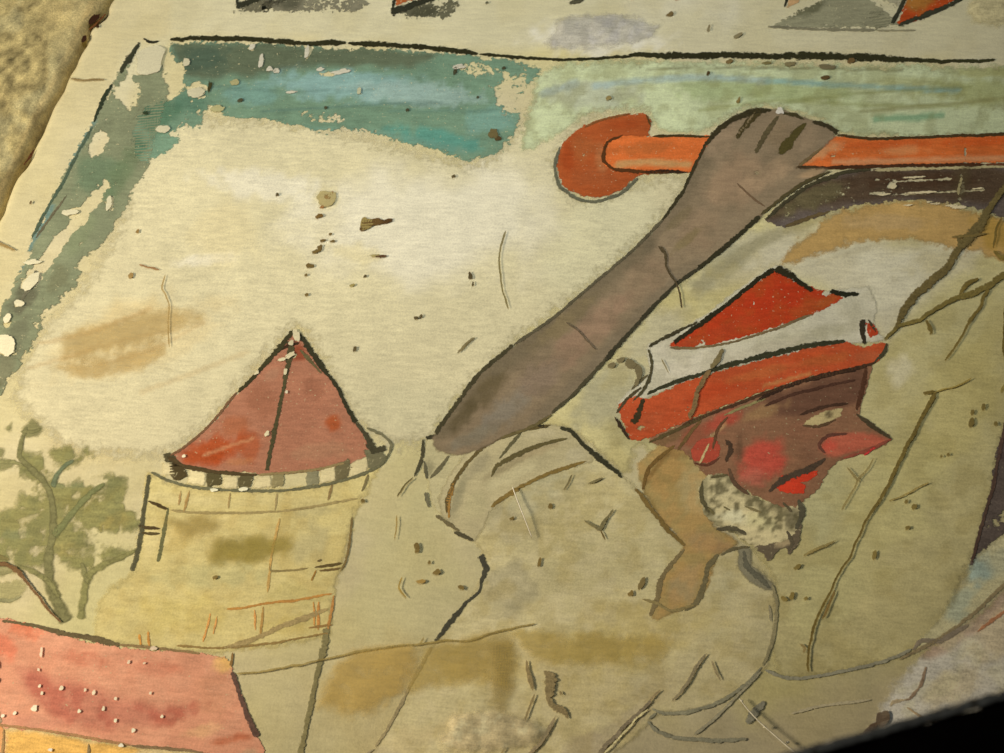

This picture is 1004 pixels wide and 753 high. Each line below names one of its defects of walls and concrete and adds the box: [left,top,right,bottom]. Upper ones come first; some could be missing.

peeling [136,45,165,75]
peeling [249,44,280,73]
peeling [187,81,212,98]
peeling [3,259,42,323]
peeling [0,335,15,356]